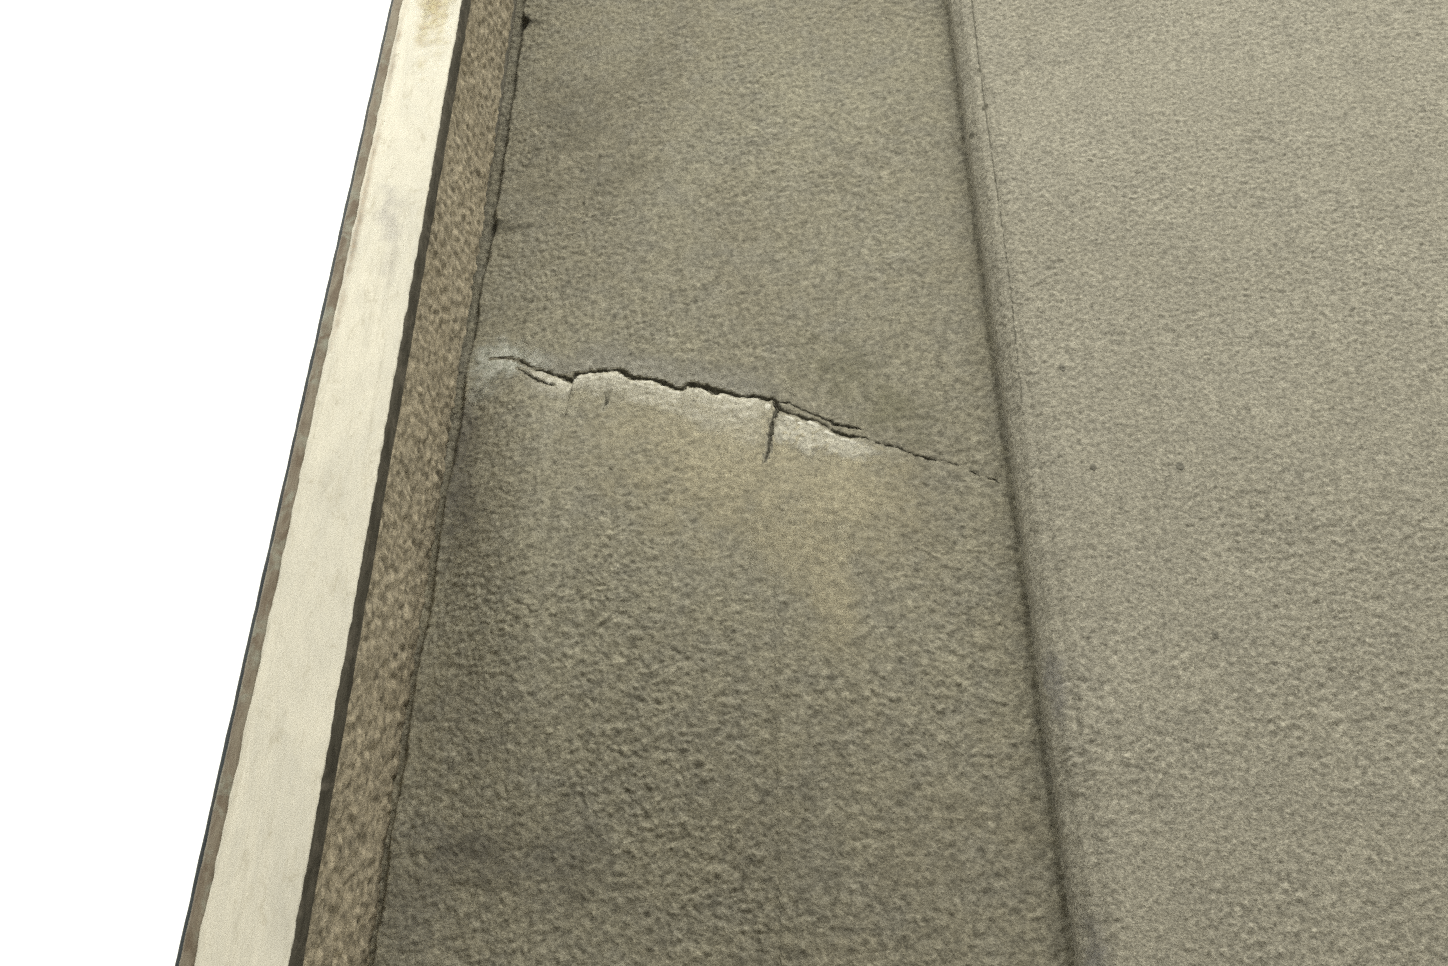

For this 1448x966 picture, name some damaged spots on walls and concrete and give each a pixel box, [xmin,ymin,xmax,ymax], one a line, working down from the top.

crack [500,358,1000,483]